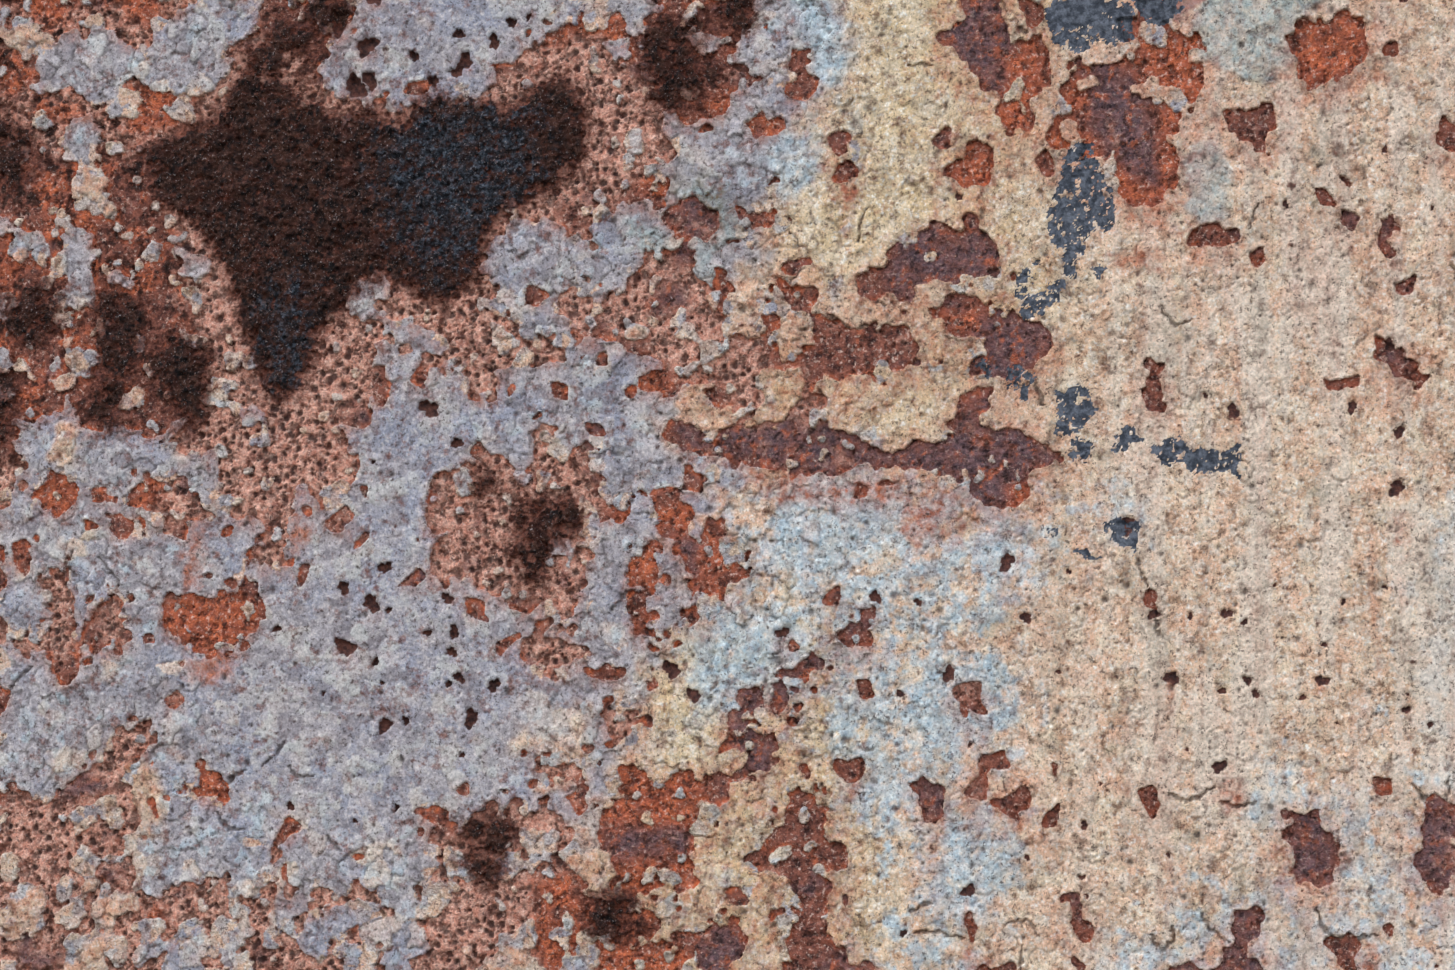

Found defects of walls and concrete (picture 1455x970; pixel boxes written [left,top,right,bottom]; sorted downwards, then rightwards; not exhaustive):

rust [619,0,777,134]
peeling [1279,2,1405,97]
rust [0,0,608,460]
peeling [0,0,1216,689]
rust [448,461,591,606]
rust [737,466,972,556]
peeling [0,406,907,970]
peeling [900,662,1090,837]
peeling [1274,803,1349,900]
peeling [1406,787,1455,904]
rust [556,876,661,963]
peeling [1164,897,1276,970]